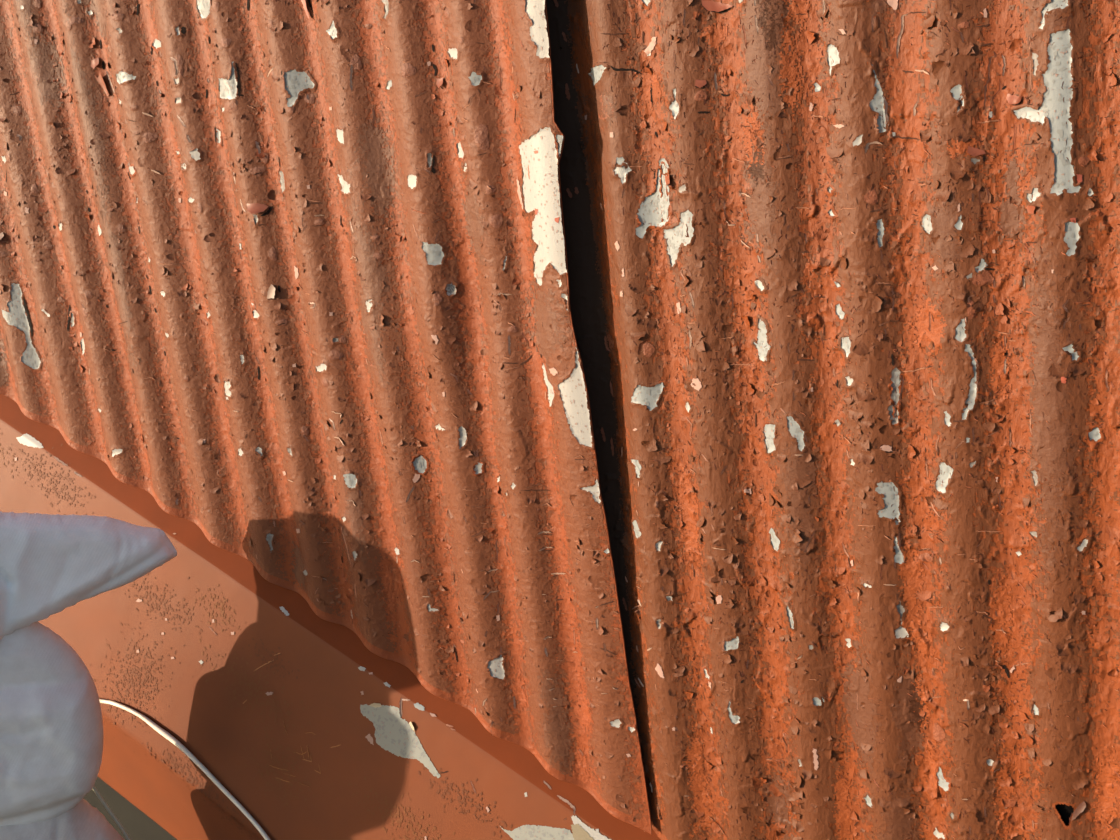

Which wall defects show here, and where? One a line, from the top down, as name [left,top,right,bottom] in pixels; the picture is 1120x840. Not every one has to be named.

corrosion [639,61,661,123]
corrosion [778,0,811,116]
peeling [498,125,569,321]
peeling [1,283,42,370]
corrosion [904,291,947,356]
peeling [541,347,594,463]
peeling [588,0,1111,840]
corrosion [674,463,701,580]
corrosion [898,531,943,803]
peeling [360,699,440,778]
peeling [500,781,611,840]
corrosion [1090,744,1120,839]